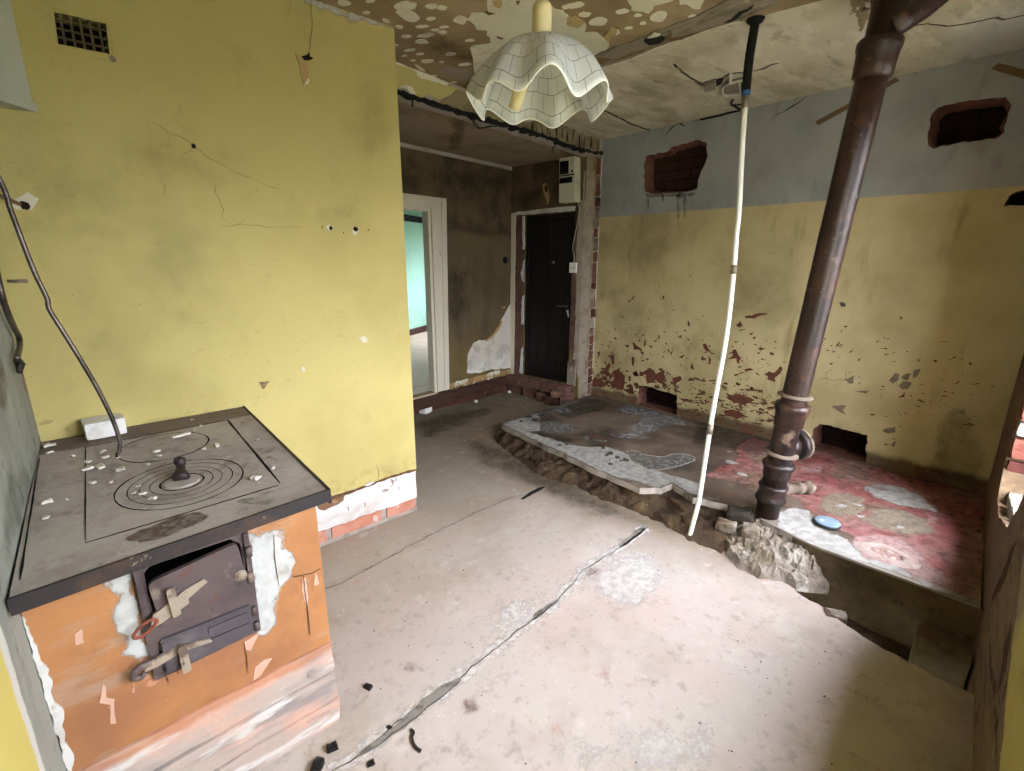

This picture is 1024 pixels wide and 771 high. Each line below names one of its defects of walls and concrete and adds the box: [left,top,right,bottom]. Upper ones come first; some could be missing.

crack [916,15,1024,27]
crack [674,63,779,86]
crack [604,110,685,137]
spalling [295,0,790,488]
peeling [844,337,994,447]
spalling [316,469,417,547]
spalling [725,518,829,594]
peeling [787,452,1024,771]